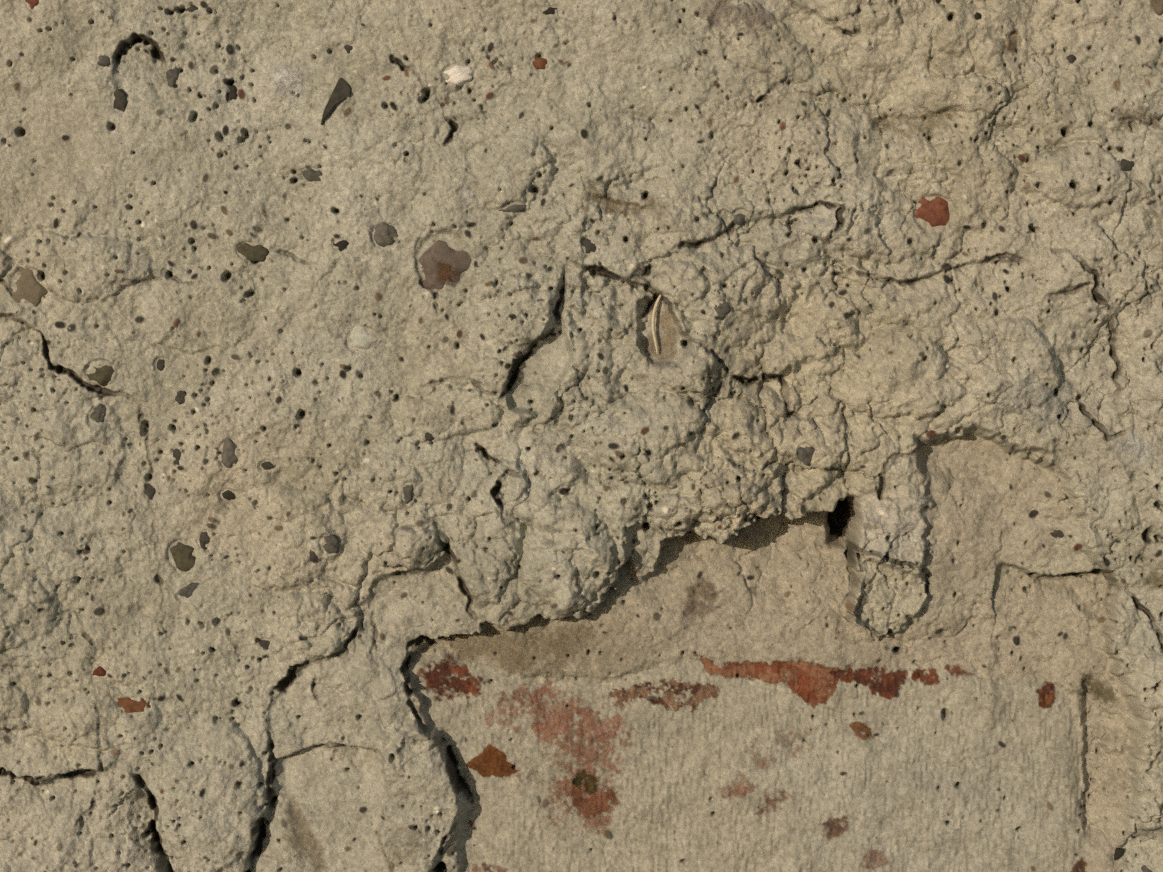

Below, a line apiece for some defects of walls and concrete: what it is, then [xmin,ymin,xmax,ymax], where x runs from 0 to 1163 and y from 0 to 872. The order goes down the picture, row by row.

crack [679,201,844,248]
crack [423,257,810,423]
crack [856,248,1126,440]
crack [0,280,169,637]
crack [477,436,542,529]
crack [878,450,915,500]
crack [75,612,98,649]
crack [245,519,477,872]
spalling [246,435,1125,872]
crack [0,703,173,872]